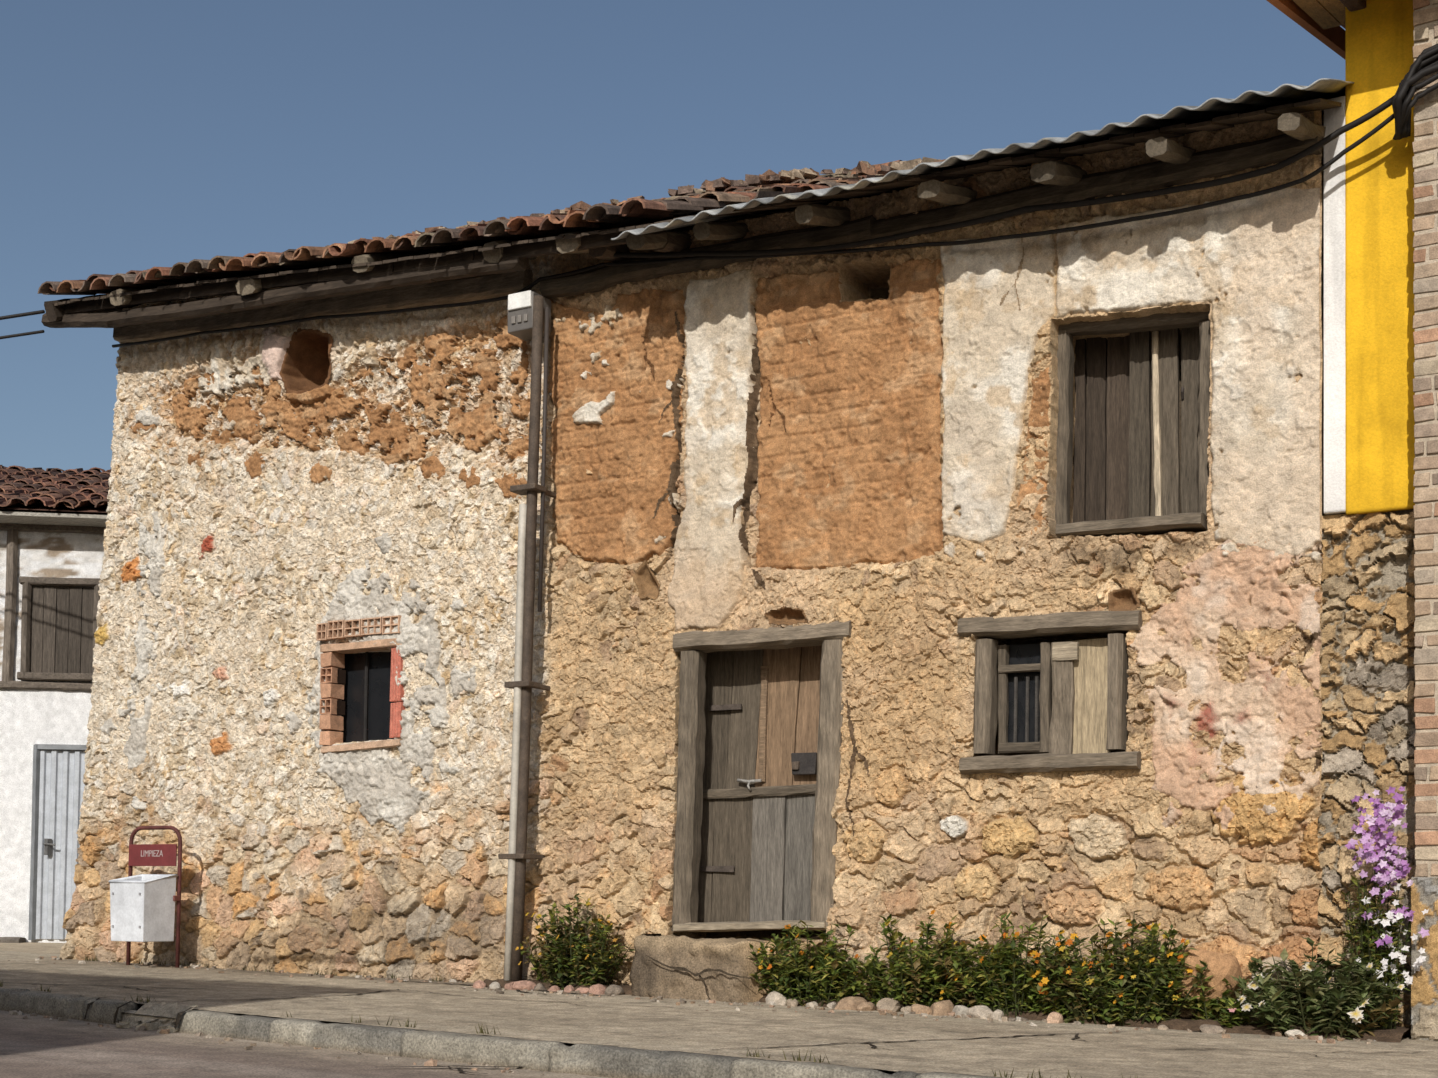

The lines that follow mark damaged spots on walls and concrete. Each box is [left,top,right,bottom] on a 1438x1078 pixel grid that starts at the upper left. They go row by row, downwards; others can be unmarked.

flaking render [130,315,530,499]
flaking render [548,187,1323,830]
flaking render [285,532,477,833]